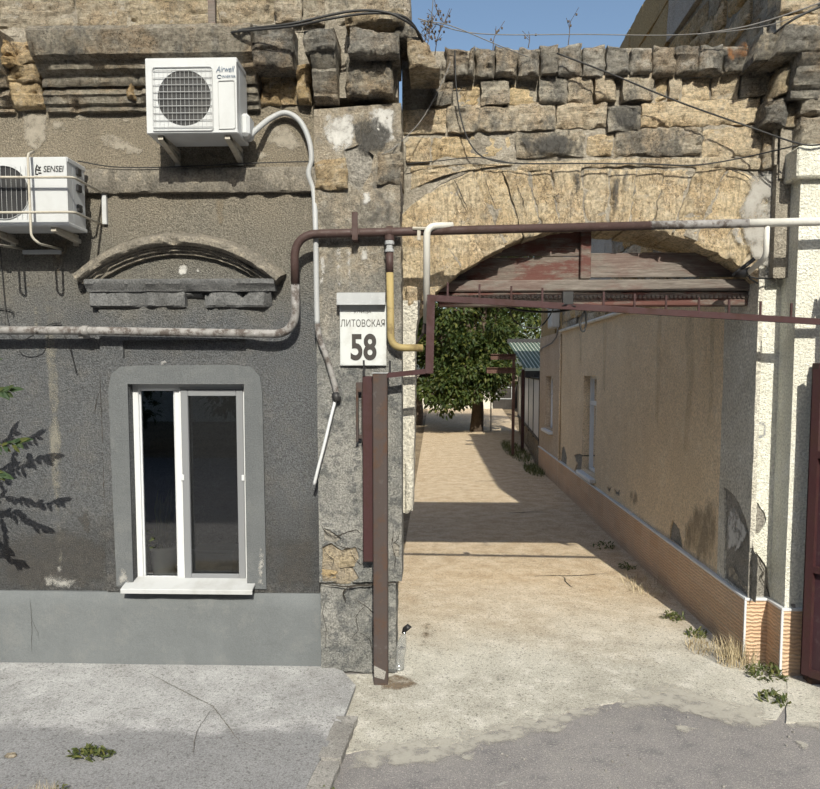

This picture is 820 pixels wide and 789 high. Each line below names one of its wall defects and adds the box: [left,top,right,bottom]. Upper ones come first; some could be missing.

flaking render [321,528,359,584]
crack [320,523,401,655]
spalling [671,522,682,547]
spalling [726,489,769,603]